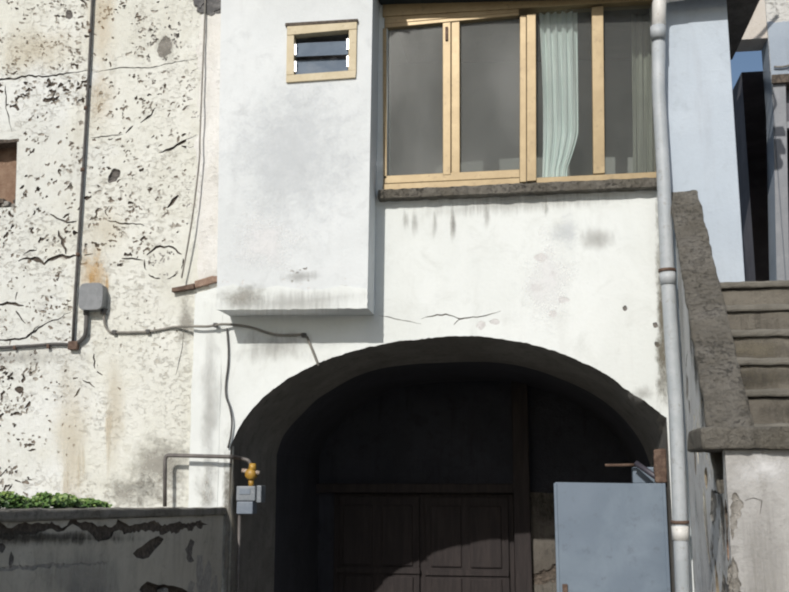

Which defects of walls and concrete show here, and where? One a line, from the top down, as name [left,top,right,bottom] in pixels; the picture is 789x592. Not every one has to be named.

crack [0,58,197,130]
crack [91,108,155,138]
crack [159,134,198,153]
crack [105,208,144,226]
crack [18,214,91,265]
crack [122,245,184,279]
crack [0,292,72,341]
crack [379,311,500,324]